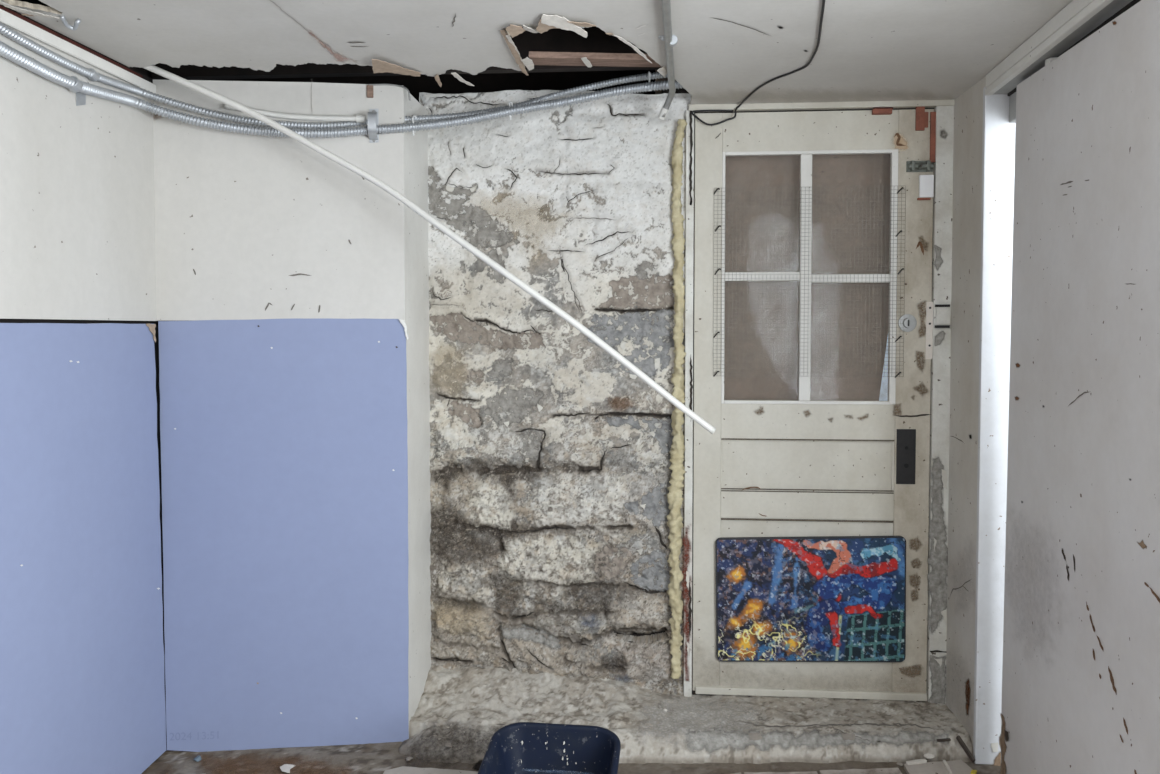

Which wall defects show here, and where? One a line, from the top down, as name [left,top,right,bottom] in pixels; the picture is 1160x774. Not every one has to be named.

crack [270,0,332,50]
peeling [506,19,614,75]
spalling [910,457,948,633]
peeling [991,714,1008,774]